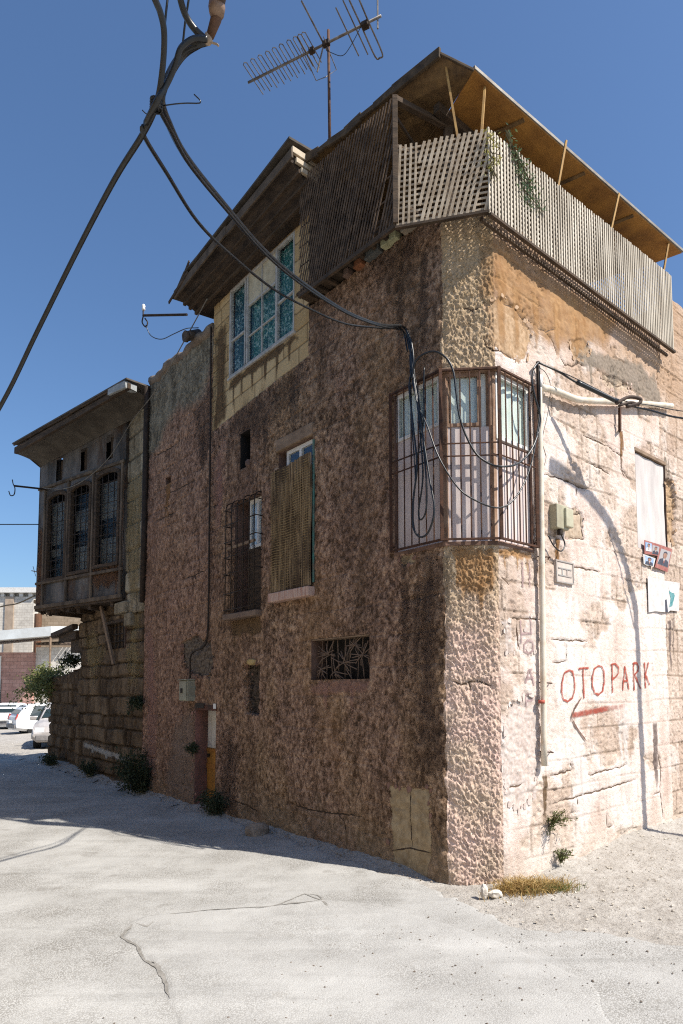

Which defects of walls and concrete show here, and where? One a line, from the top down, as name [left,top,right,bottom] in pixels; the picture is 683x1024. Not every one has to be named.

flaking render [483,293,533,362]
crack [120,893,328,998]